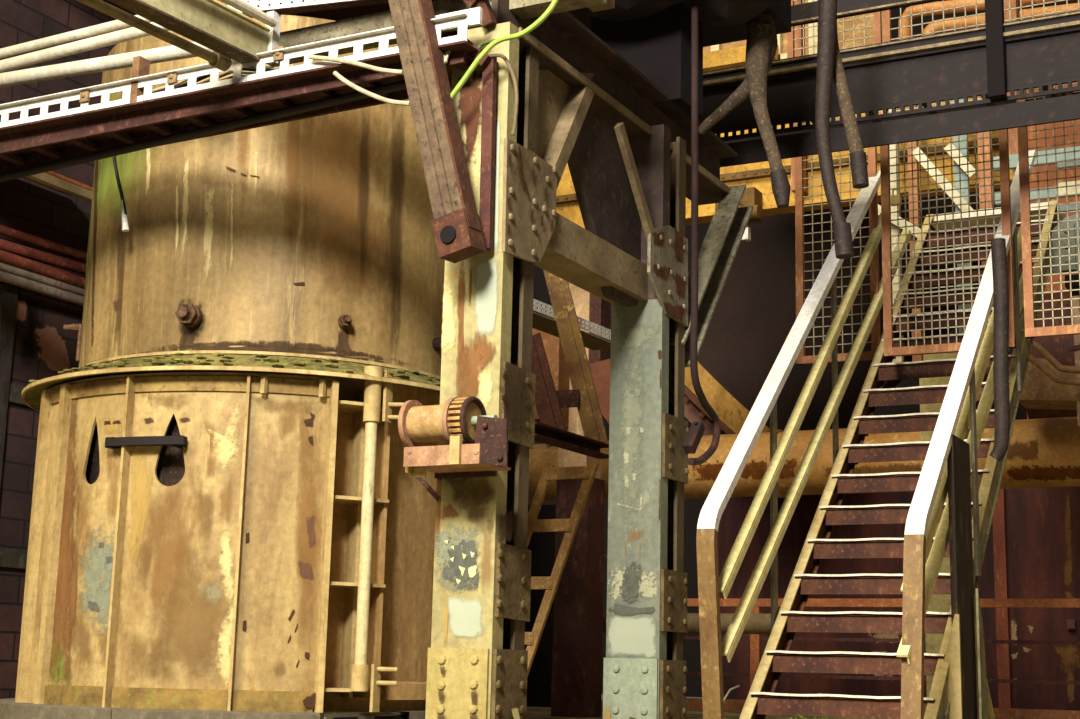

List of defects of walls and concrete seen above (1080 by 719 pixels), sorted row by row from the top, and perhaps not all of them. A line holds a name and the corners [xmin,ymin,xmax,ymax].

leakage [176,161,189,249]
leakage [204,190,214,274]
leakage [359,137,368,252]
leakage [390,130,403,308]
rust [653,228,686,322]
rust [456,269,472,397]
rust [693,460,724,481]
rust [741,460,767,479]
peeling [80,527,115,634]
peeling [435,527,479,592]
peeling [608,561,657,616]
rust [1006,441,1080,599]